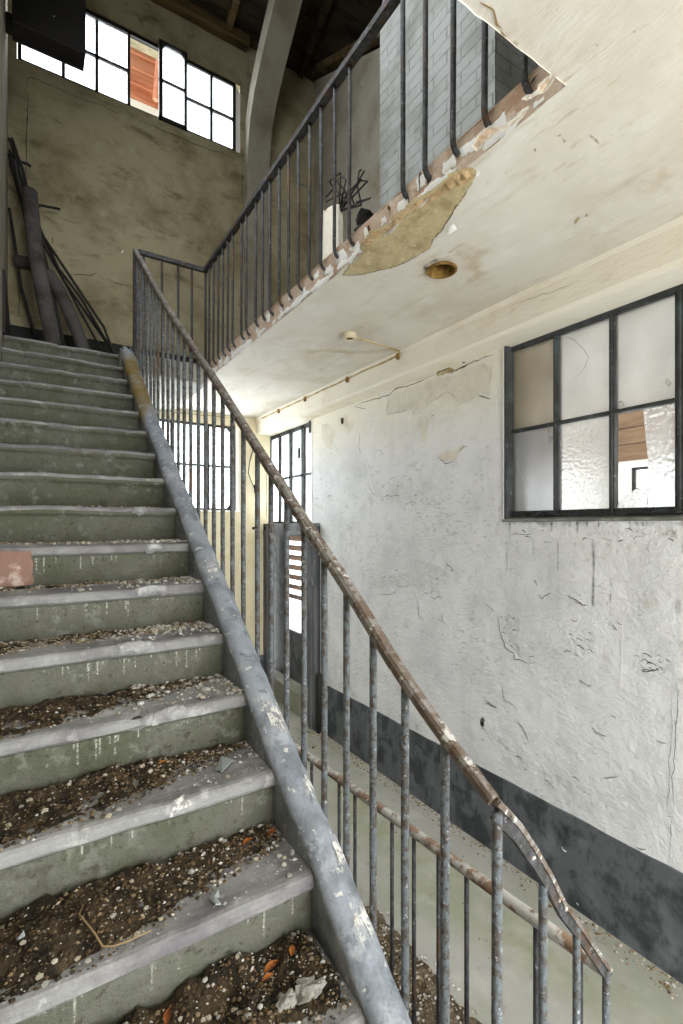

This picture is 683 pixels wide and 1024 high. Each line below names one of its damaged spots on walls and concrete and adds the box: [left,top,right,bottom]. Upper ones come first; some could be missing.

spalling [213,73,557,372]
crack [484,602,534,665]
crack [534,580,589,641]